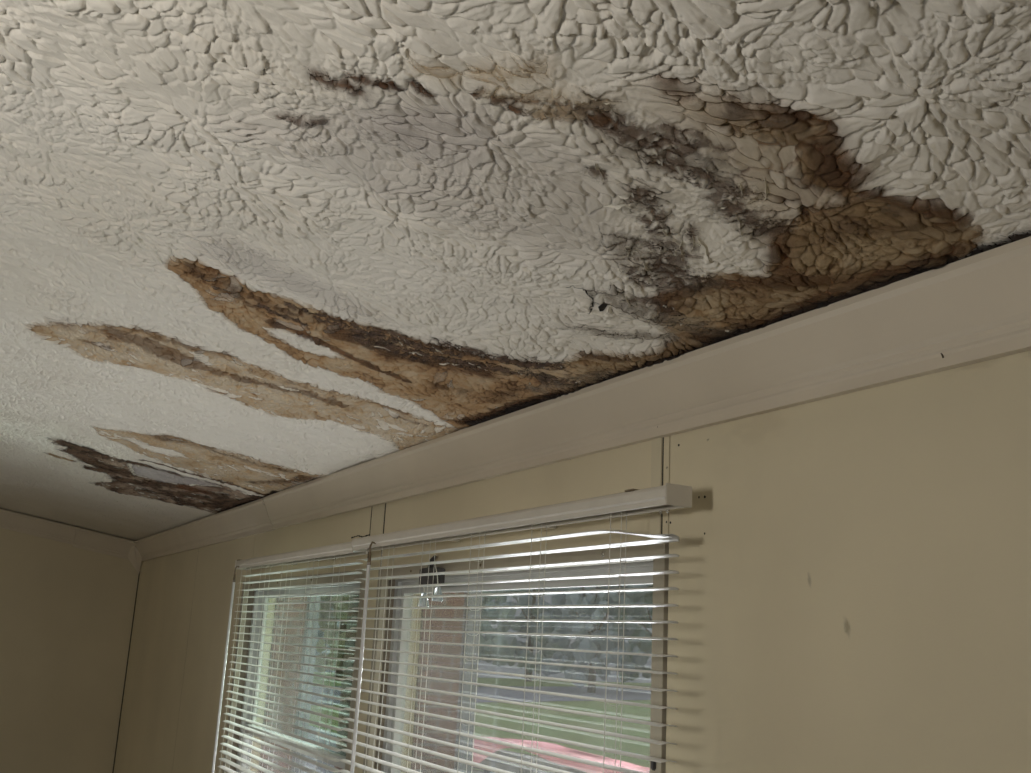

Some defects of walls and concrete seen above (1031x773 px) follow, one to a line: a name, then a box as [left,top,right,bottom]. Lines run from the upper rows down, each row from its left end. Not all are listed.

damp [30,66,1031,450]